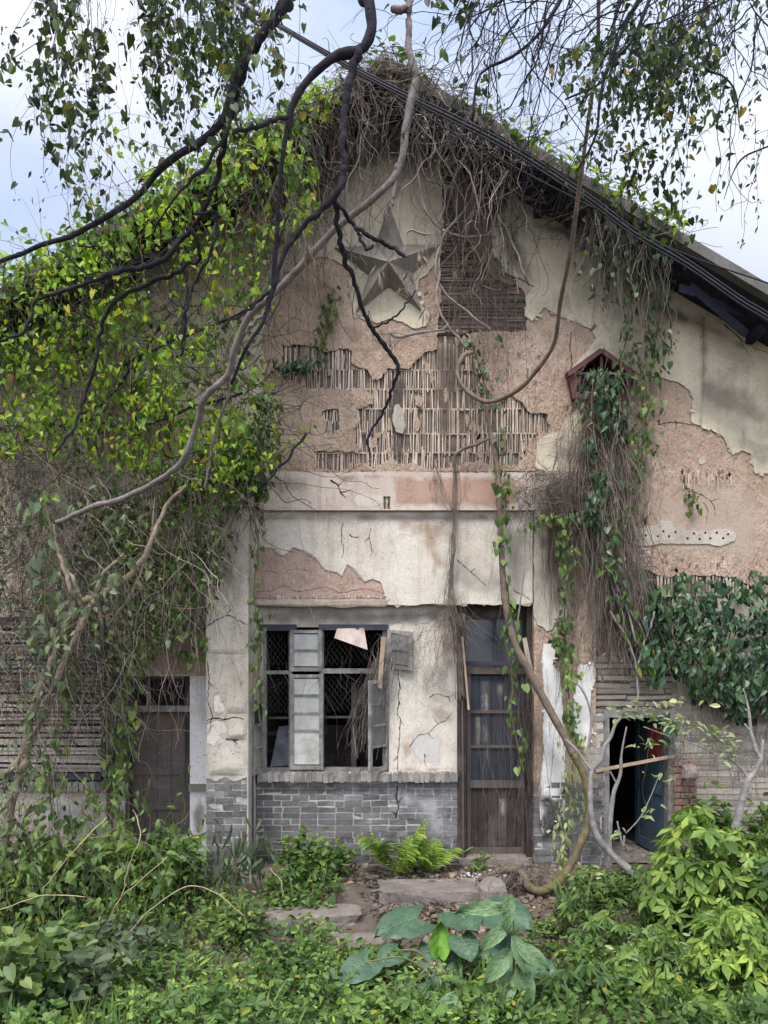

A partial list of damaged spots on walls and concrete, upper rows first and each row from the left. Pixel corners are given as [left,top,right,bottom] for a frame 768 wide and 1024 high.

flaking render [258,251,602,472]
flaking render [255,547,390,601]
crack [341,523,375,559]
flaking render [619,374,768,594]
crack [207,661,247,745]
crack [392,673,452,818]
flaking render [539,639,597,833]